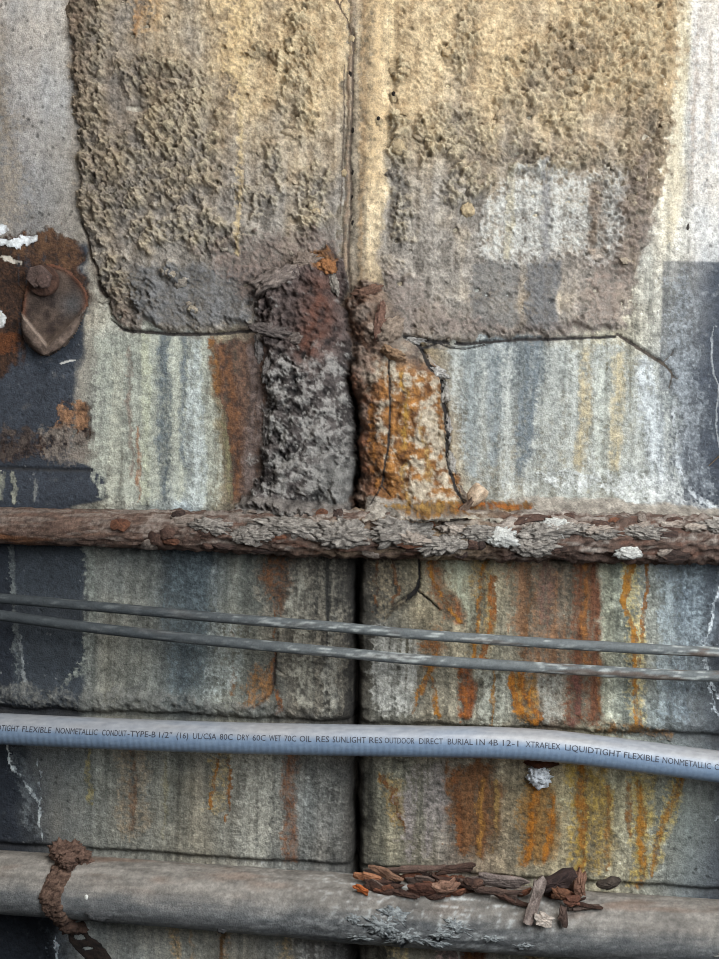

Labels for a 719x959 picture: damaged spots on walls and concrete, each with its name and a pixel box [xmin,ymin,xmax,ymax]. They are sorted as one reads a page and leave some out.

flaking render [65,0,359,339]
crack [335,0,356,298]
flaking render [373,0,691,351]
rust [0,221,98,387]
rust [0,398,95,469]
damp [87,325,227,510]
rust [207,335,265,506]
crack [406,559,439,609]
rust [380,498,537,521]
rust [411,559,674,742]
rust [441,758,686,928]